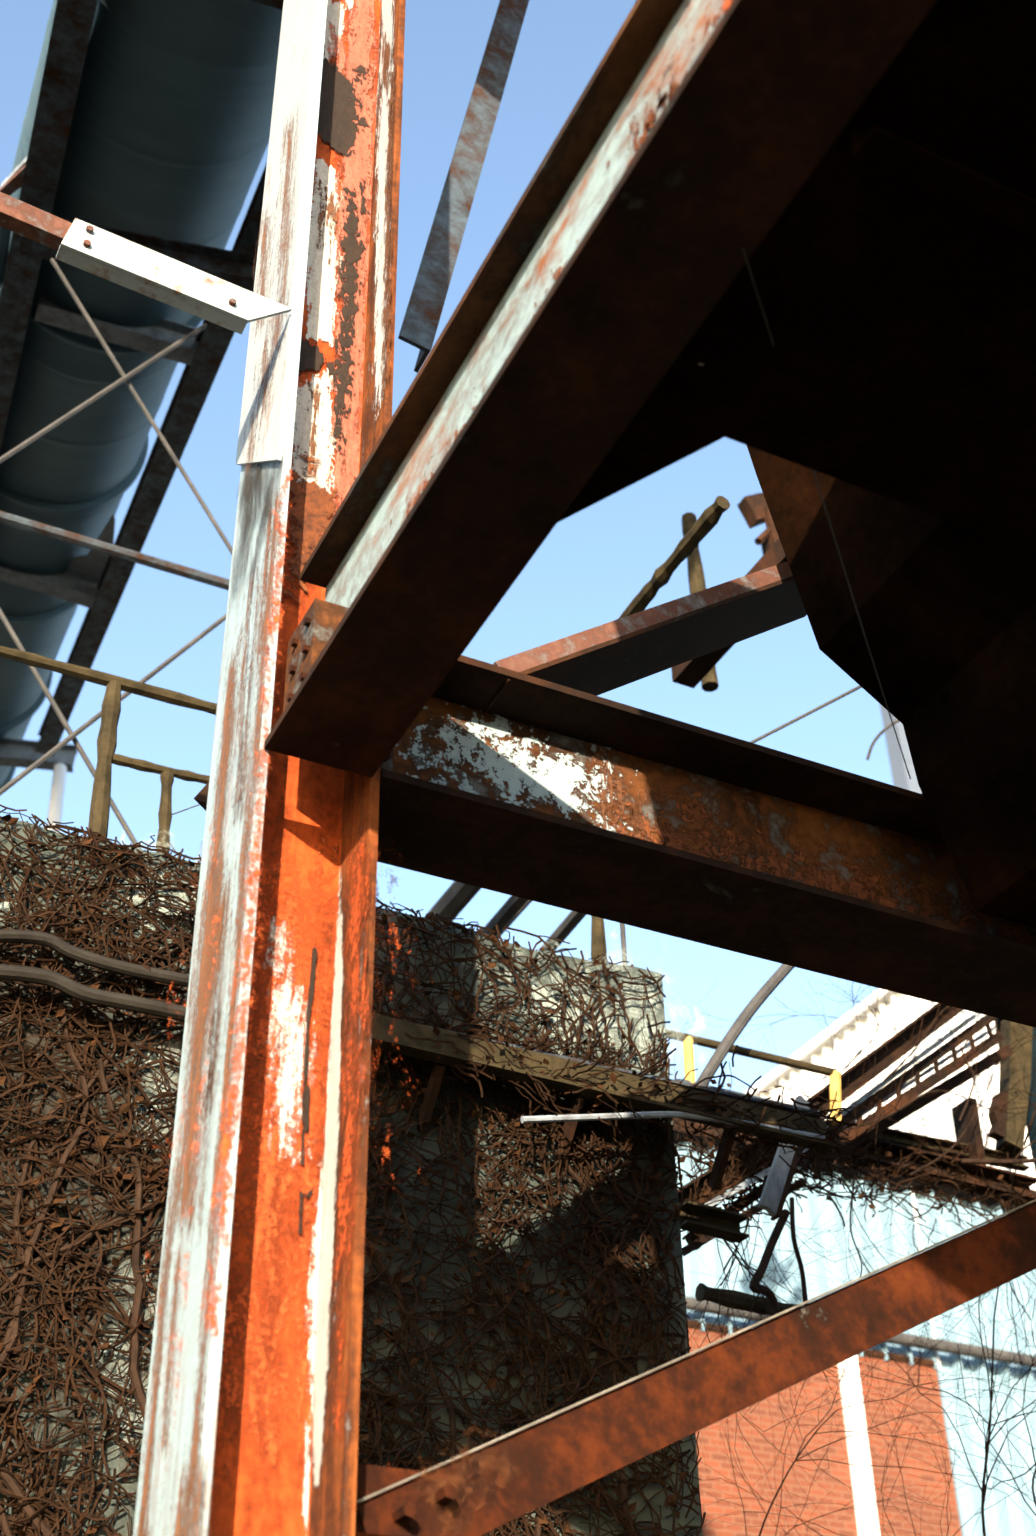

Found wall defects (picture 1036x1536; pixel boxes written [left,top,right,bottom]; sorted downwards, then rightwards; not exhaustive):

rust [606,0,733,195]
rust [389,381,487,527]
rust [138,0,399,1536]
peeling [395,702,638,833]
peeling [266,873,343,1527]